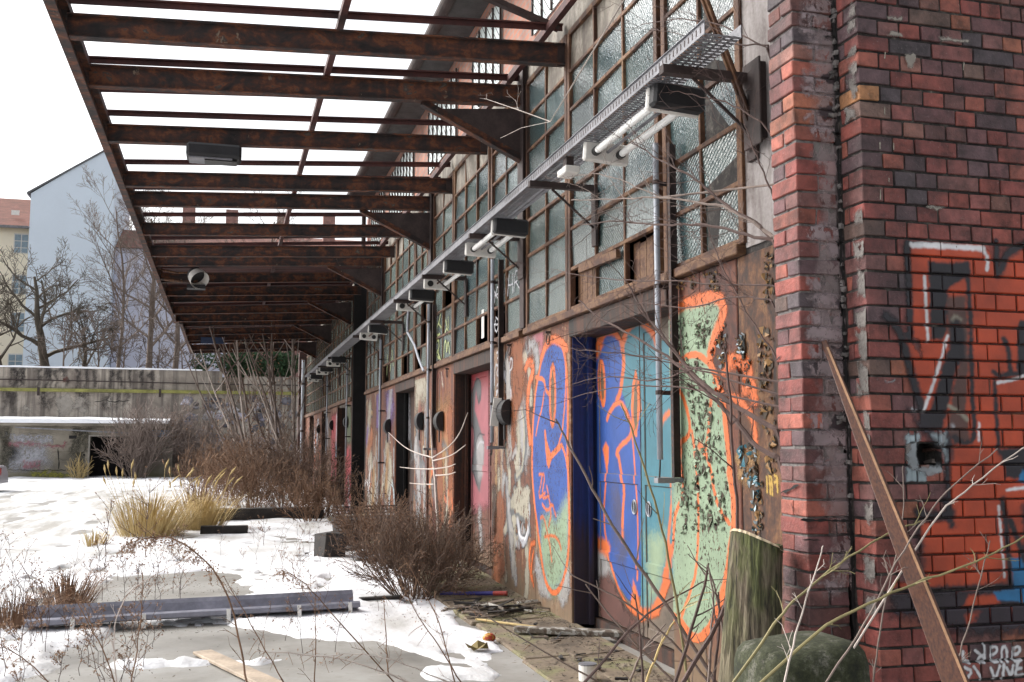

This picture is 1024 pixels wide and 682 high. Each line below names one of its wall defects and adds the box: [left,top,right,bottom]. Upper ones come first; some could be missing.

peeling [761,252,774,304]
water stain [4,366,154,408]
peeling [677,316,777,536]
spalling [905,443,936,469]